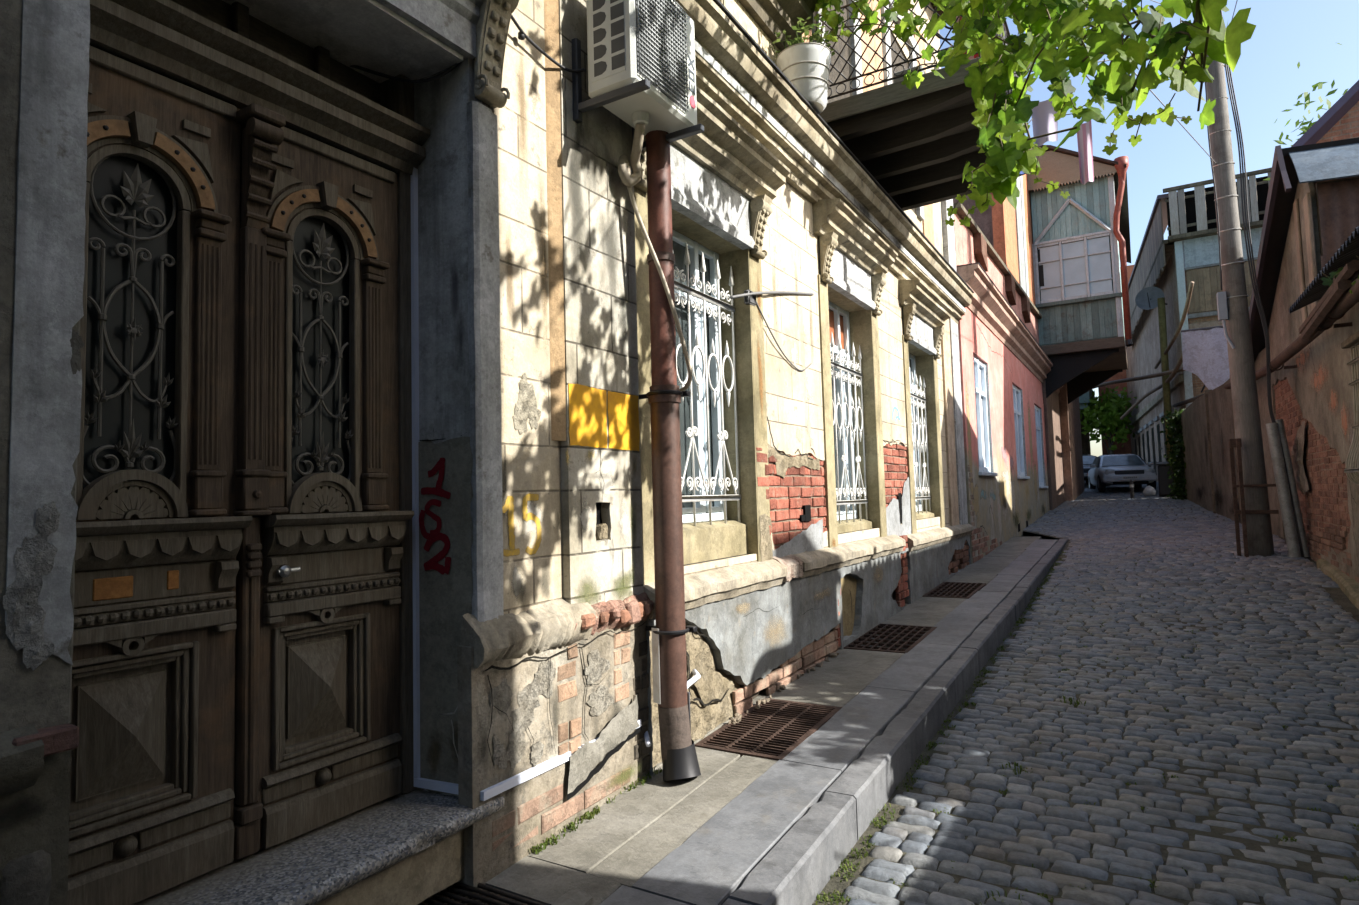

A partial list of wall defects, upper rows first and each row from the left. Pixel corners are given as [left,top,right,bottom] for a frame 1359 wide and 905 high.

flaking render [3,501,61,670]
flaking render [488,625,662,851]
crack [686,631,729,706]
flaking render [685,574,857,741]
flaking render [756,444,827,549]
flaking render [883,443,909,607]
flaking render [1274,380,1359,583]